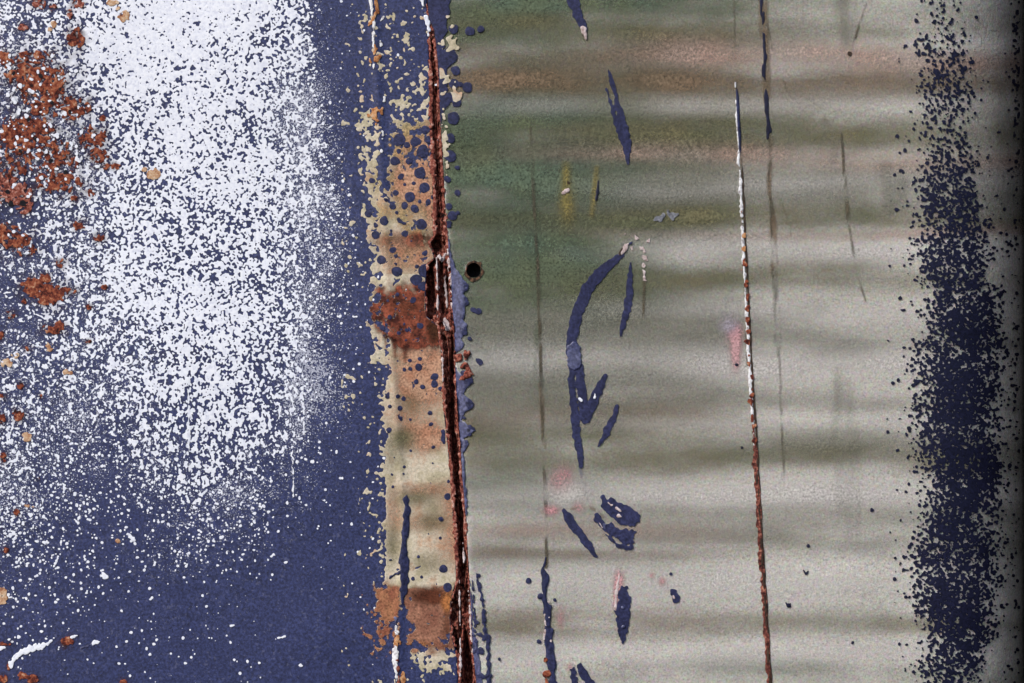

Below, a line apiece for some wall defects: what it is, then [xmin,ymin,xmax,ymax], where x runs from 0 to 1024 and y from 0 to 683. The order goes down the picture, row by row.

rust [20,258,77,305]
rust [0,50,120,256]
peeling [0,0,482,683]
rust [362,0,476,683]